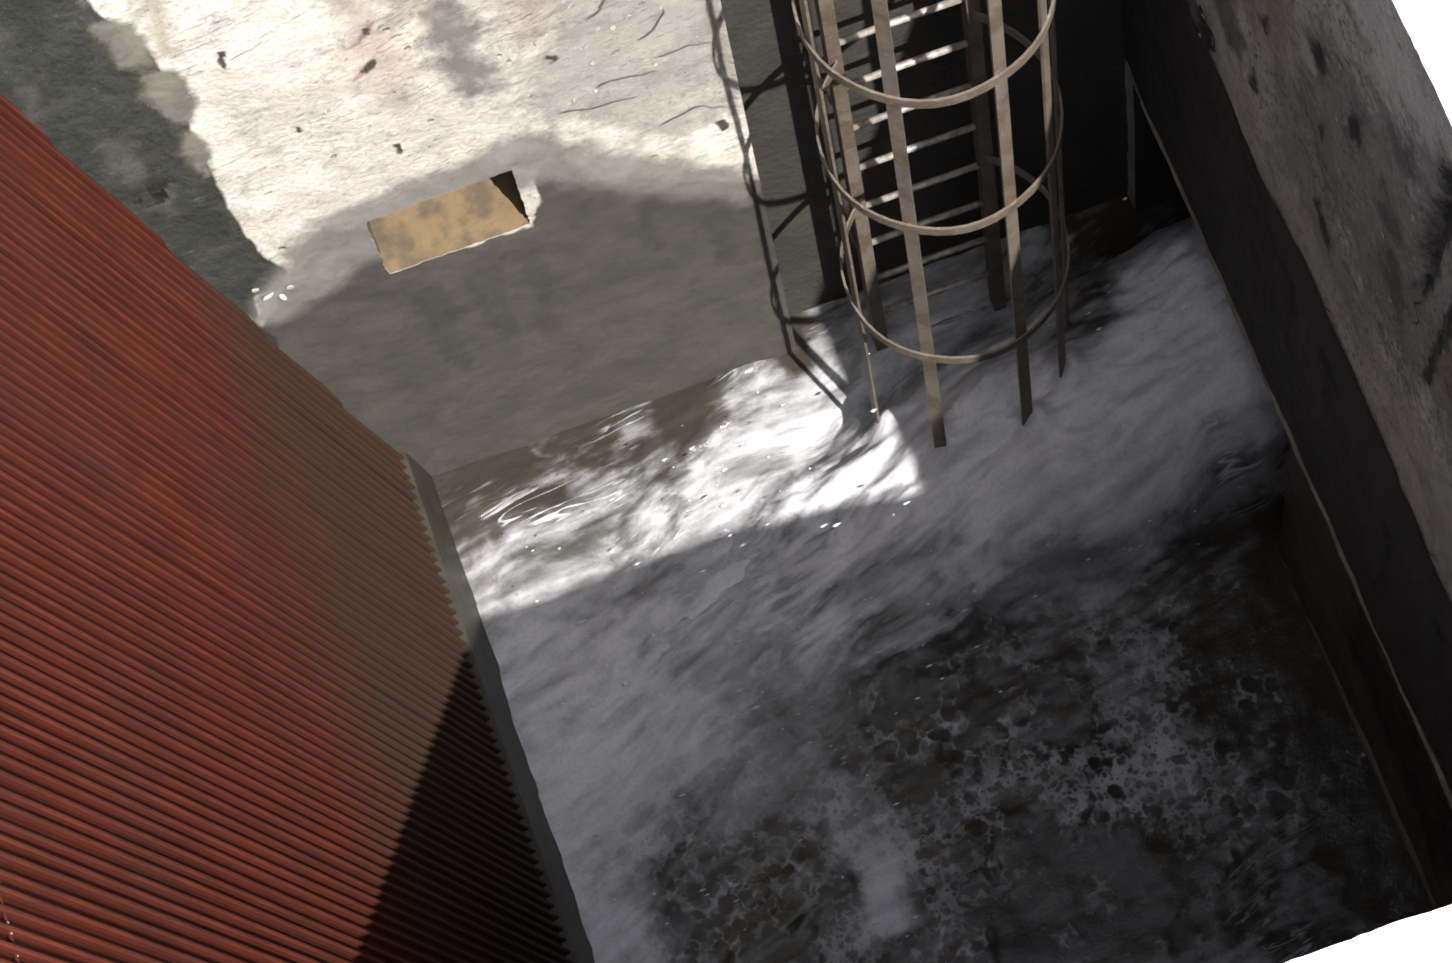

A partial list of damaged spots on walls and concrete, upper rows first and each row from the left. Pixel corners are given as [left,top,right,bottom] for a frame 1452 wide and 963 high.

damp [0,0,797,476]
damp [1121,0,1452,909]
crack [1232,110,1452,605]